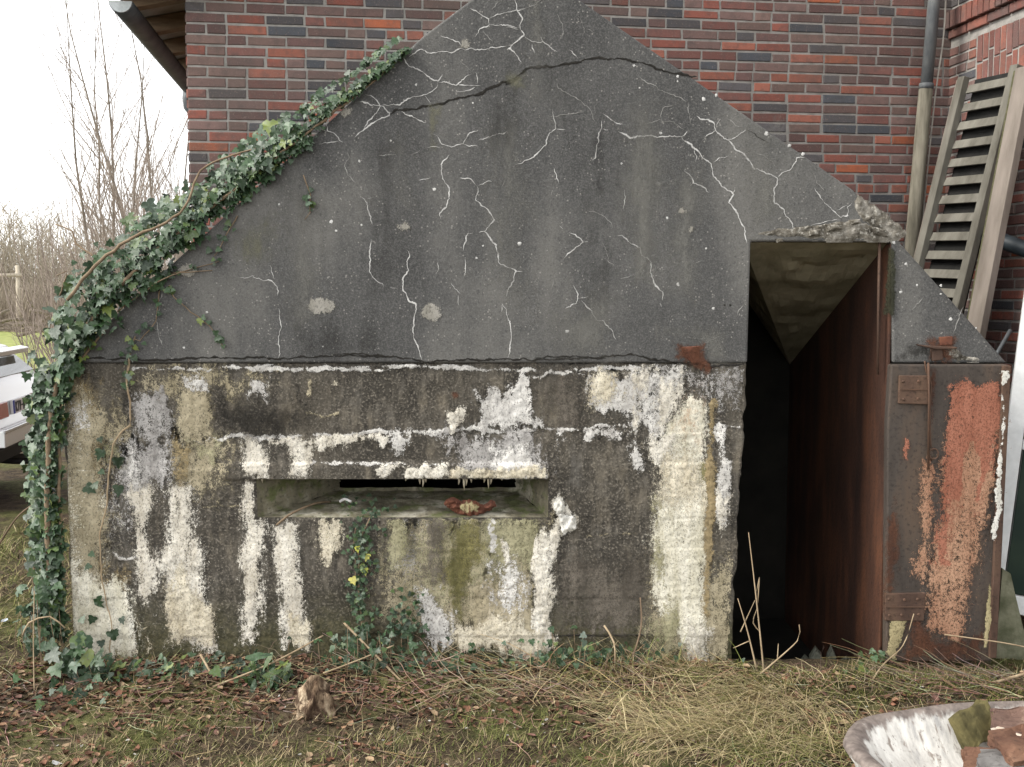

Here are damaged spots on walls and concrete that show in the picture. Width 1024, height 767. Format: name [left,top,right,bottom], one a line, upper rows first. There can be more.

crack [78,1,850,369]
spalling [758,195,907,244]
leakage [65,363,744,661]